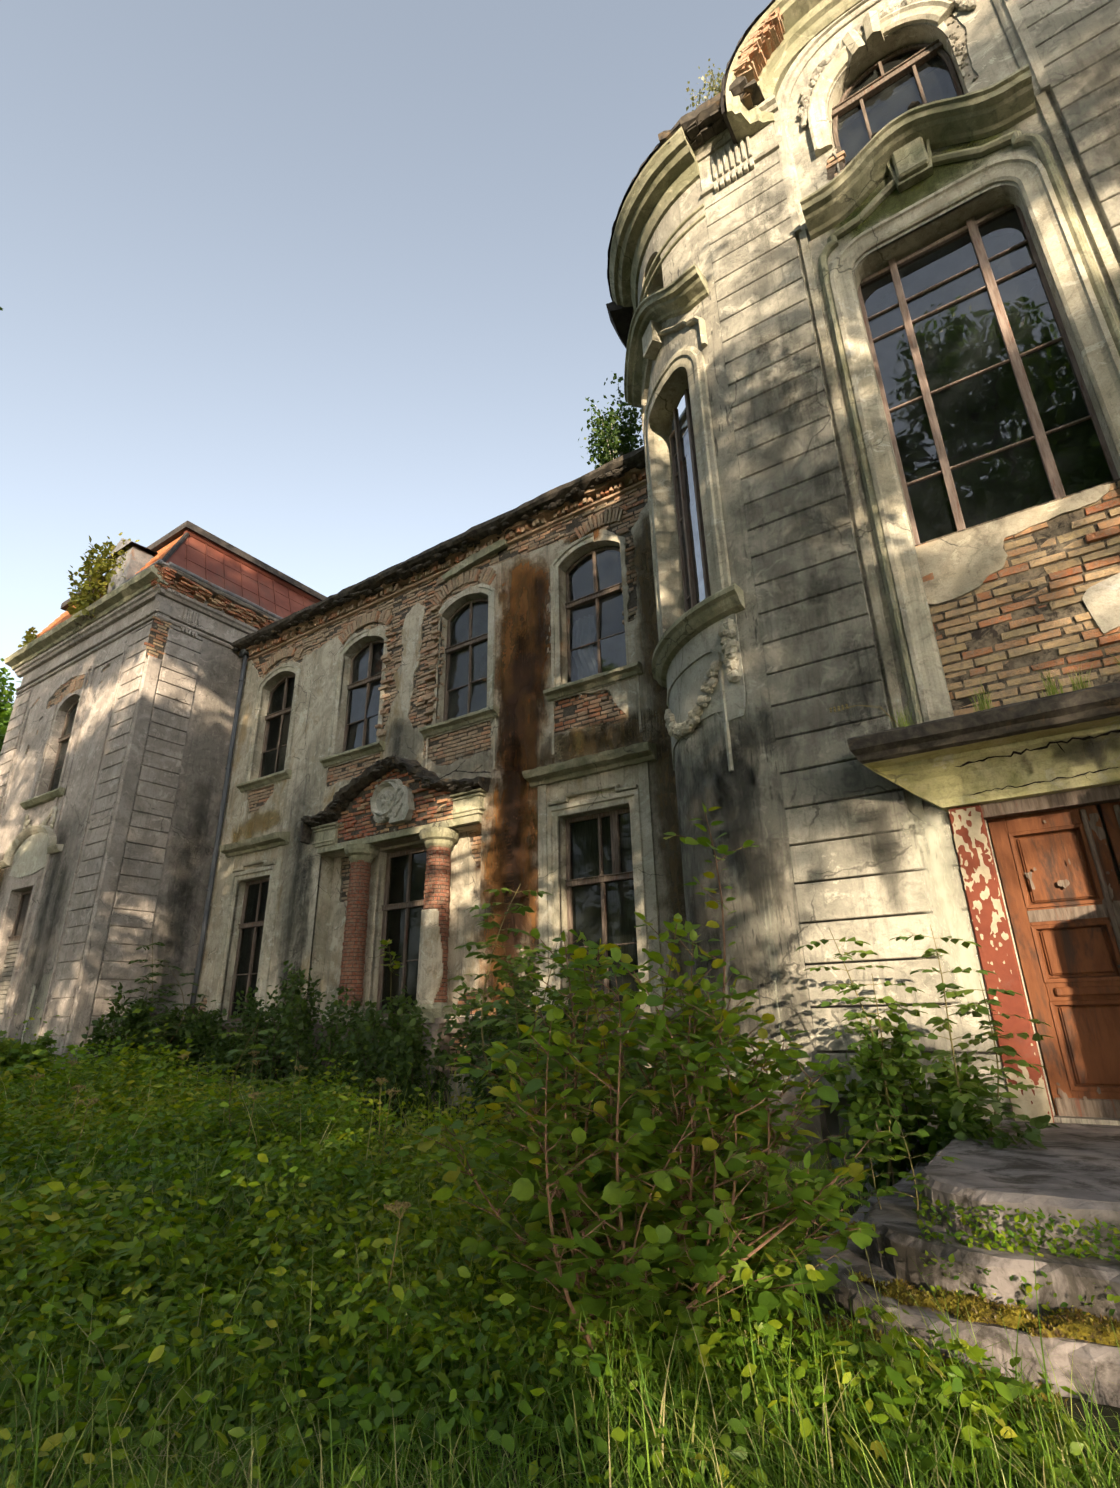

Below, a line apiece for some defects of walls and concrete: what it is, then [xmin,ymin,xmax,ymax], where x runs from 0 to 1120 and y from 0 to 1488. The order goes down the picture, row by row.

flaking render [247,785,275,814]
flaking render [252,481,648,902]
rust [476,559,551,1017]
peeling [948,807,1012,1014]
flaking render [915,478,1120,716]
peeling [1004,1043,1101,1123]